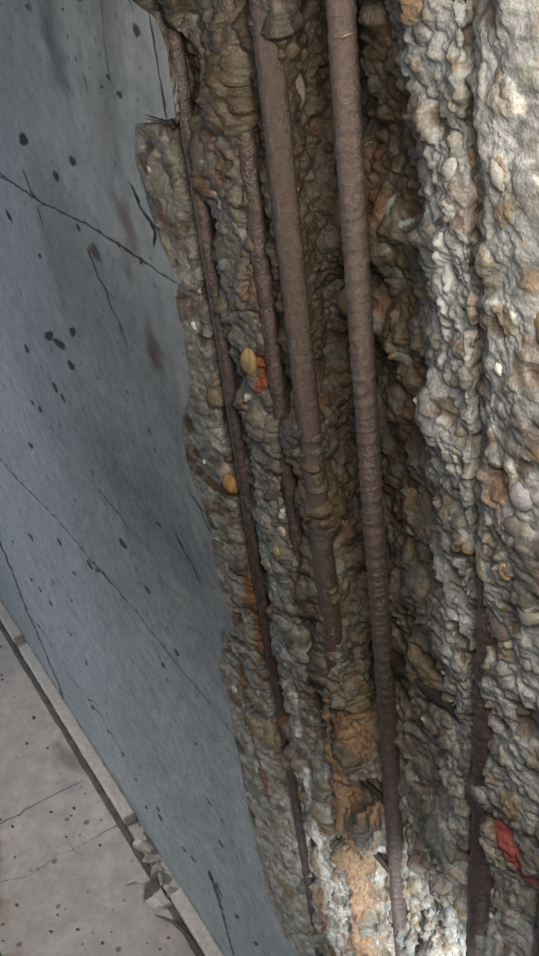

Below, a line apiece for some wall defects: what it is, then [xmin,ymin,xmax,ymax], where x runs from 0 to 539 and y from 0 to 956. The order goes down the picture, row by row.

crack [0,171,175,343]
rust [208,480,240,496]
spalling [126,0,539,956]
crack [0,542,64,699]
rust [244,556,278,669]
rust [251,733,270,801]
rust [322,697,384,956]
crack [208,871,234,956]
rust [316,888,329,935]